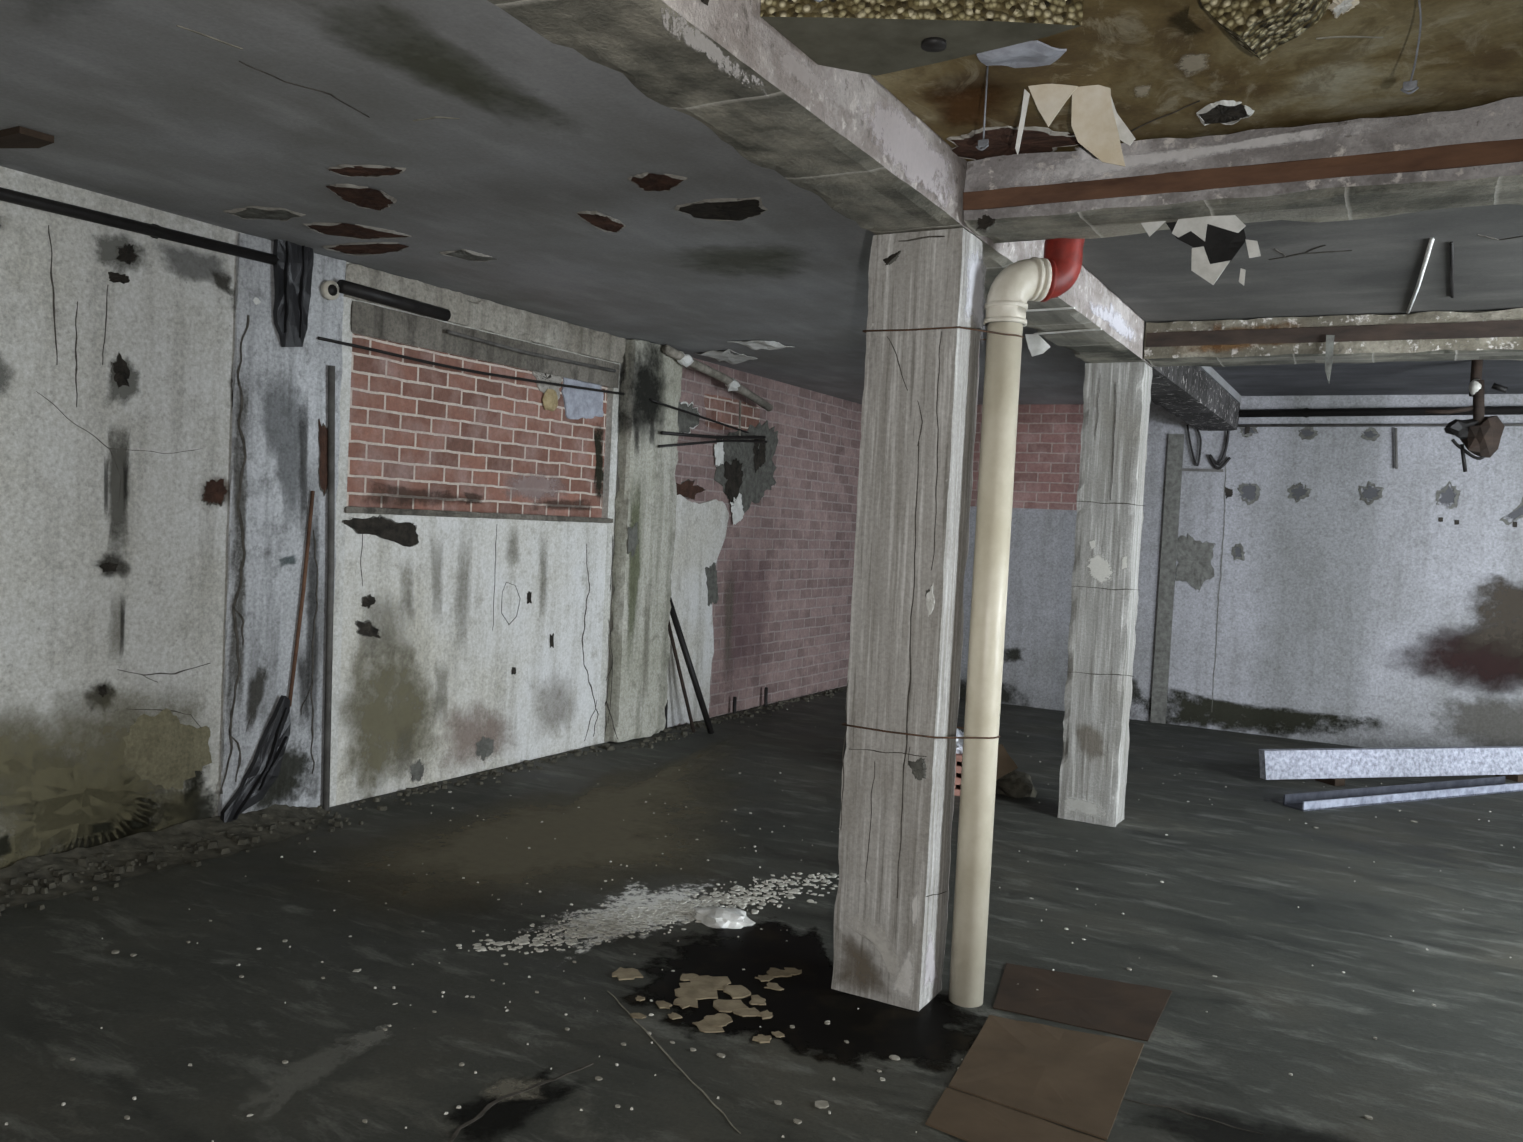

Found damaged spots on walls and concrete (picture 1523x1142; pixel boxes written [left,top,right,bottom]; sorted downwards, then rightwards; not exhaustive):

spalling [223,164,411,256]
spalling [678,401,700,433]
water stain [105,432,129,540]
crack [117,315,250,794]
flaking render [342,515,419,547]
spalling [676,479,705,500]
water stain [1407,577,1523,746]
water stain [1132,680,1380,736]
water stain [0,702,217,869]